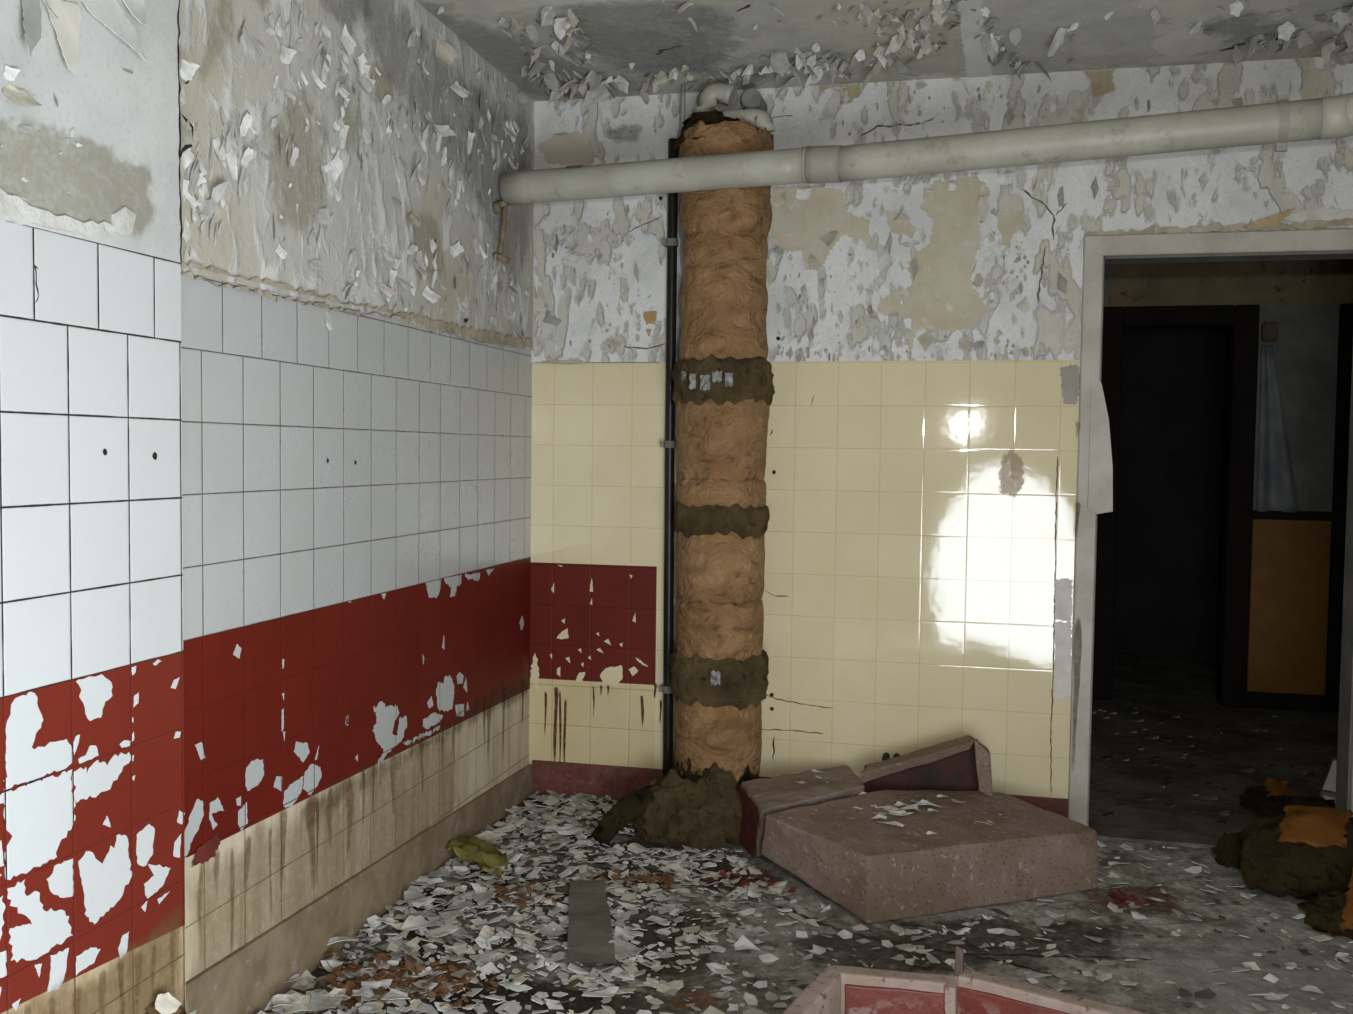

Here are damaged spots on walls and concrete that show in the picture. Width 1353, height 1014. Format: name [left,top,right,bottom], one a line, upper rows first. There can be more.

peeling [22,0,148,74]
peeling [1187,0,1353,67]
spalling [0,177,136,237]
peeling [181,0,1084,364]
spalling [1085,206,1353,235]
peeling [1060,364,1113,514]
peeling [426,568,494,598]
peeling [530,619,648,691]
crack [1050,457,1058,793]
peeling [76,674,113,721]
peeling [372,672,469,766]
peeling [0,691,322,1014]